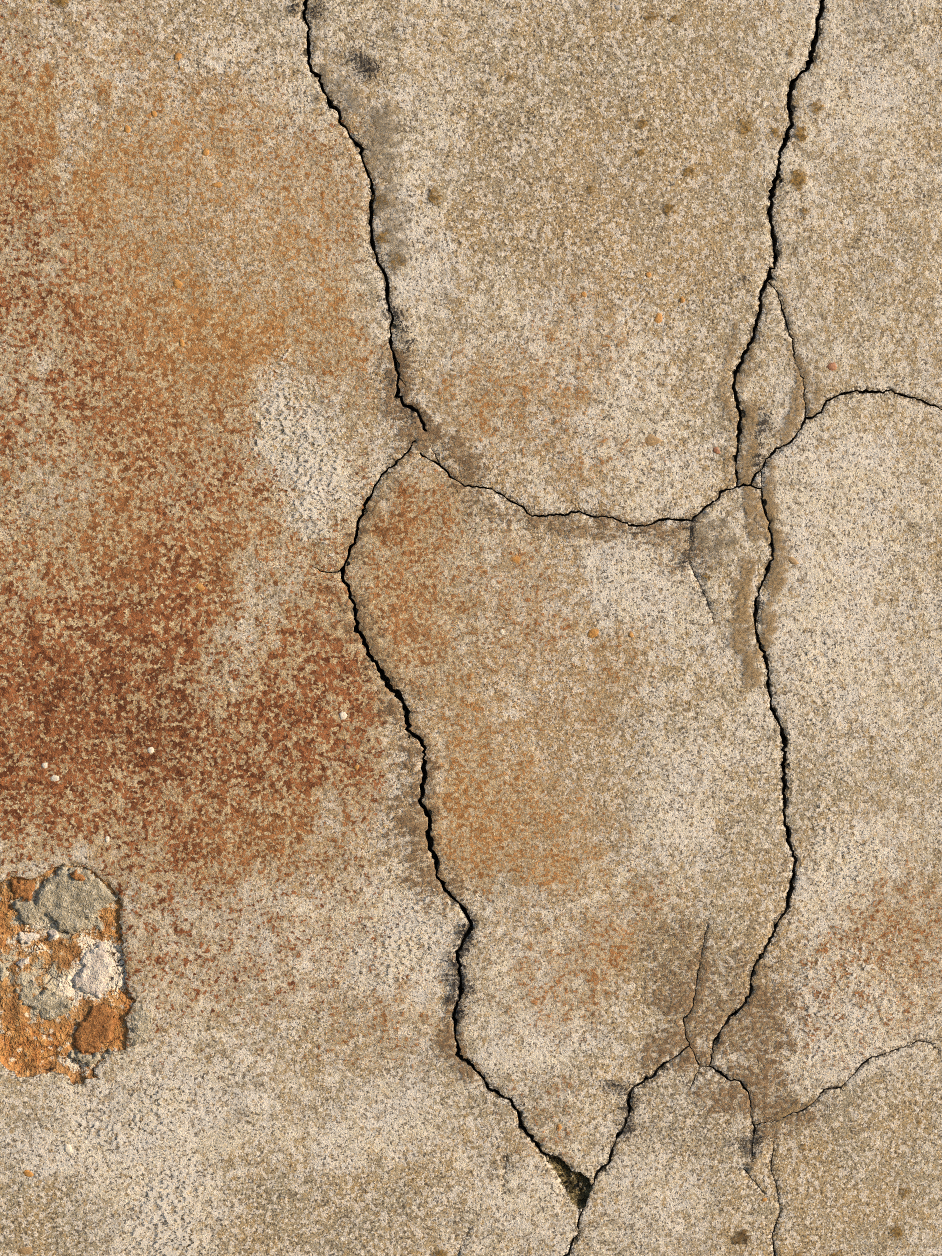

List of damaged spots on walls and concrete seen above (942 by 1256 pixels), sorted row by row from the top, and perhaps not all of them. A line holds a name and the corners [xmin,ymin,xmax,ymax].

spalling [0,864,153,1085]
corrosion [0,0,689,1082]
corrosion [498,1065,587,1168]
crack [301,0,942,1256]